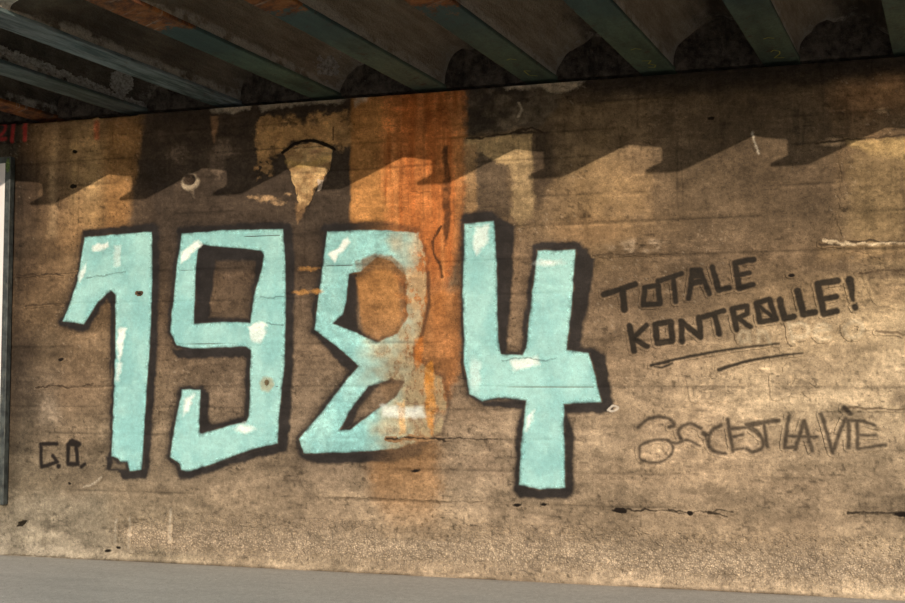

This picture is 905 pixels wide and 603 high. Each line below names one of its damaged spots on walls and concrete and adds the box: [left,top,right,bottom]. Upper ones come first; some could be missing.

peeling [241,104,358,228]
corrosion [347,89,474,439]
crack [873,328,905,338]
corrosion [359,444,456,541]